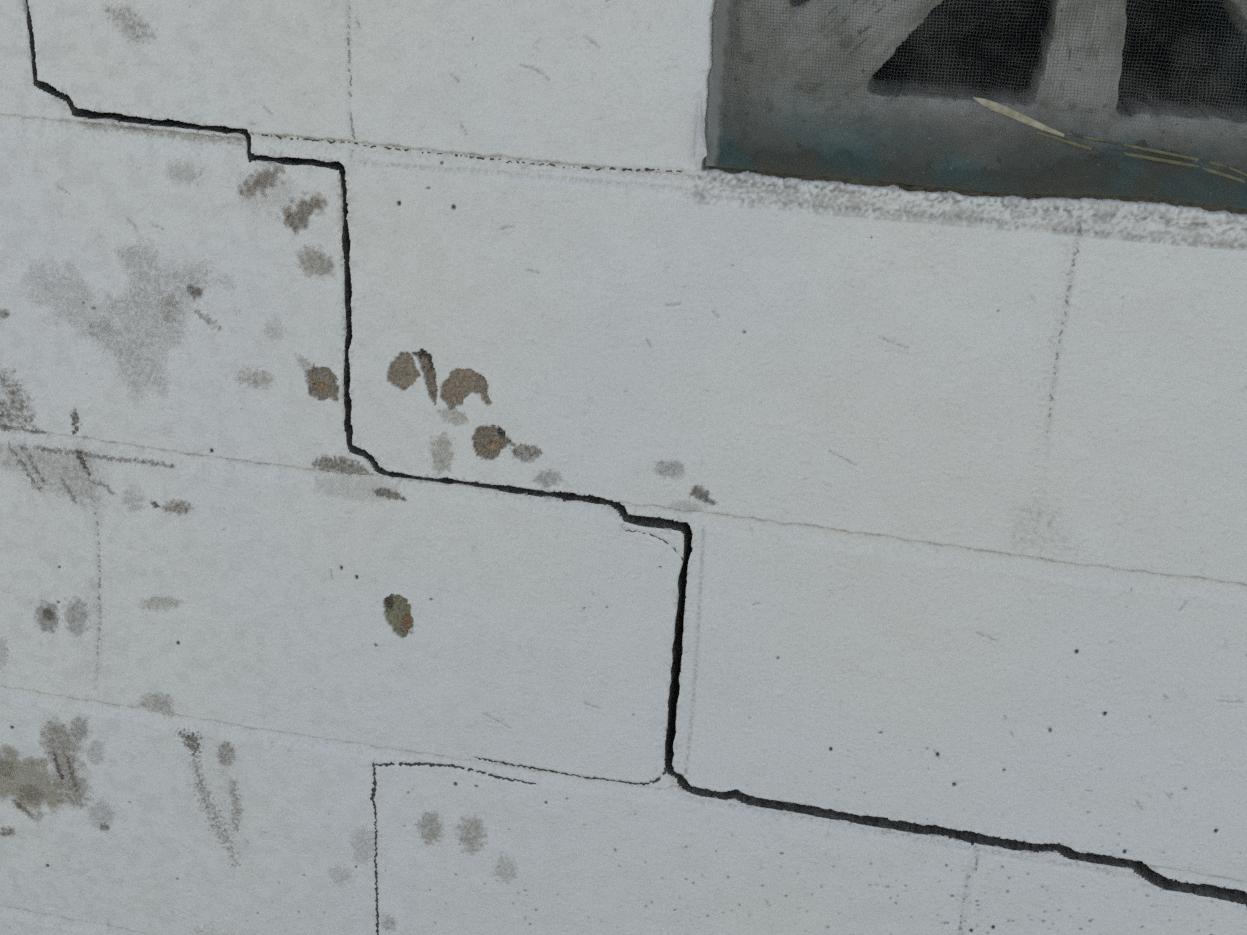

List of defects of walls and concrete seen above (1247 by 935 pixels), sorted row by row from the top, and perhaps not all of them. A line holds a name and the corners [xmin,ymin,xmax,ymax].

crack [345,6,353,97]
crack [262,113,409,151]
crack [422,152,565,168]
crack [582,165,682,173]
peeling [307,367,339,400]
peeling [388,349,491,409]
peeling [472,425,542,462]
peeling [384,594,414,637]
crack [474,757,660,786]